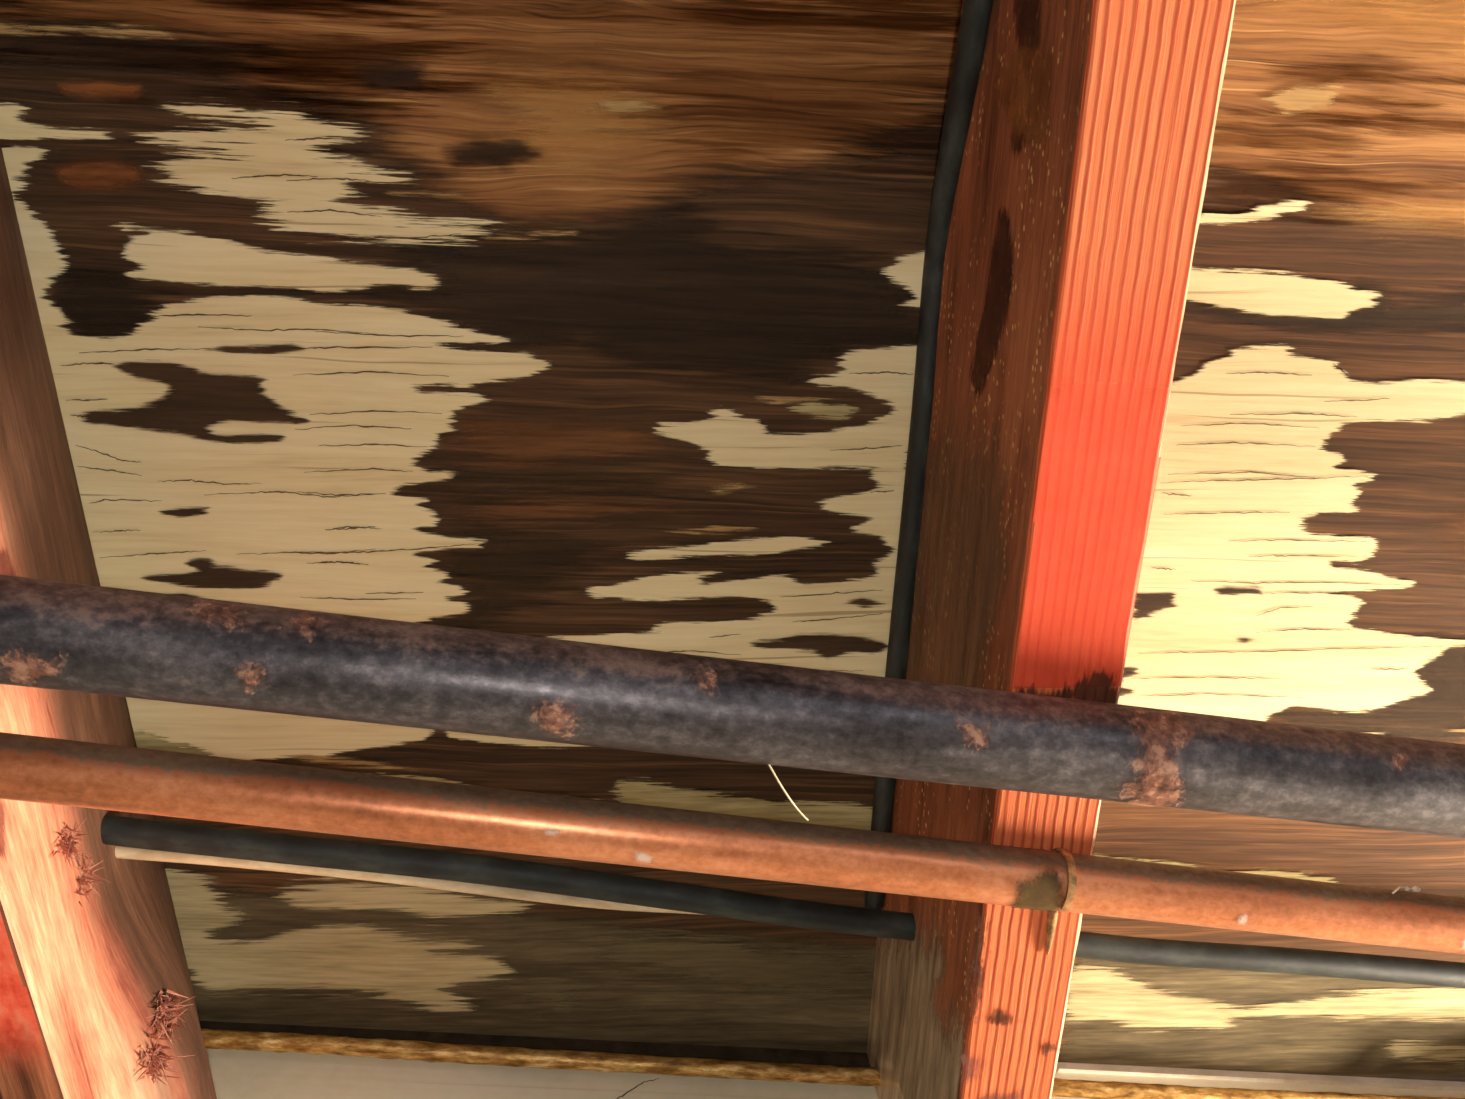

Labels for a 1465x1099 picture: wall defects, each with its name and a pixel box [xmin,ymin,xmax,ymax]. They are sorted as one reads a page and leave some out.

peeling [60,81,139,96]
peeling [601,101,658,112]
peeling [1199,200,1313,223]
peeling [880,252,925,307]
peeling [1186,268,1381,319]
peeling [0,102,574,623]
peeling [475,503,653,523]
peeling [548,346,917,677]
peeling [1118,346,1465,721]
peeling [126,697,584,786]
peeling [596,777,873,830]
peeling [165,869,534,1012]